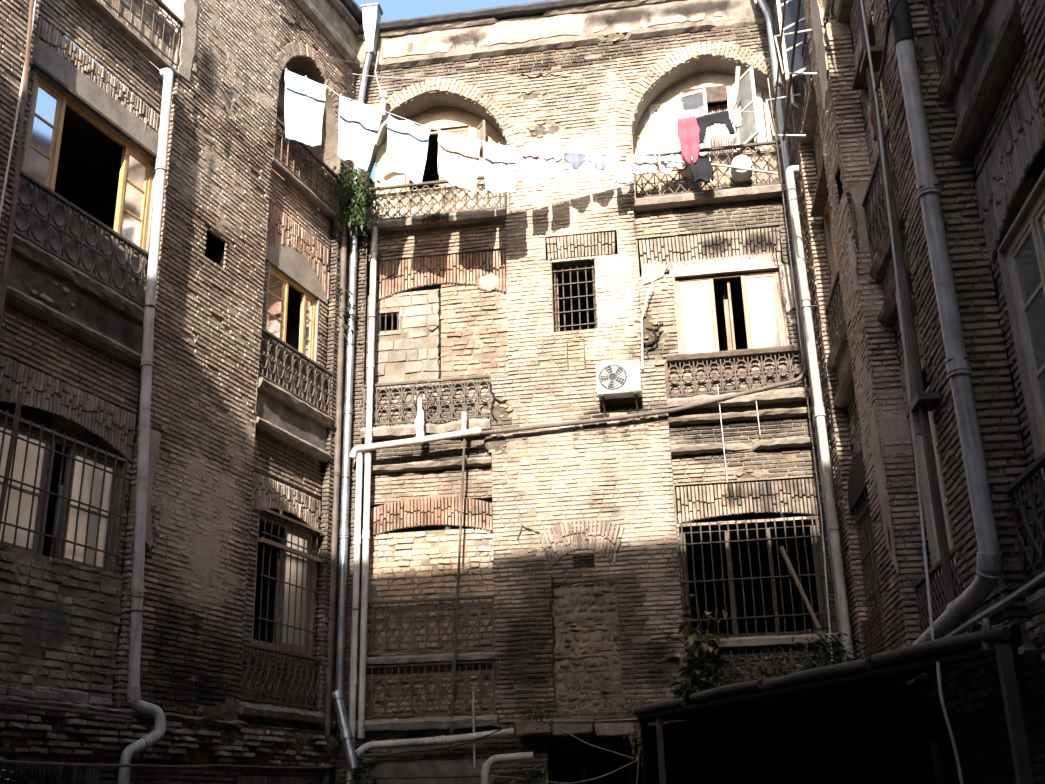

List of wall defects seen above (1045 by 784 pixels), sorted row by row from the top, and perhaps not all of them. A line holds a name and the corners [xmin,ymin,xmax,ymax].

peeling [383,14,626,59]
peeling [639,12,723,28]